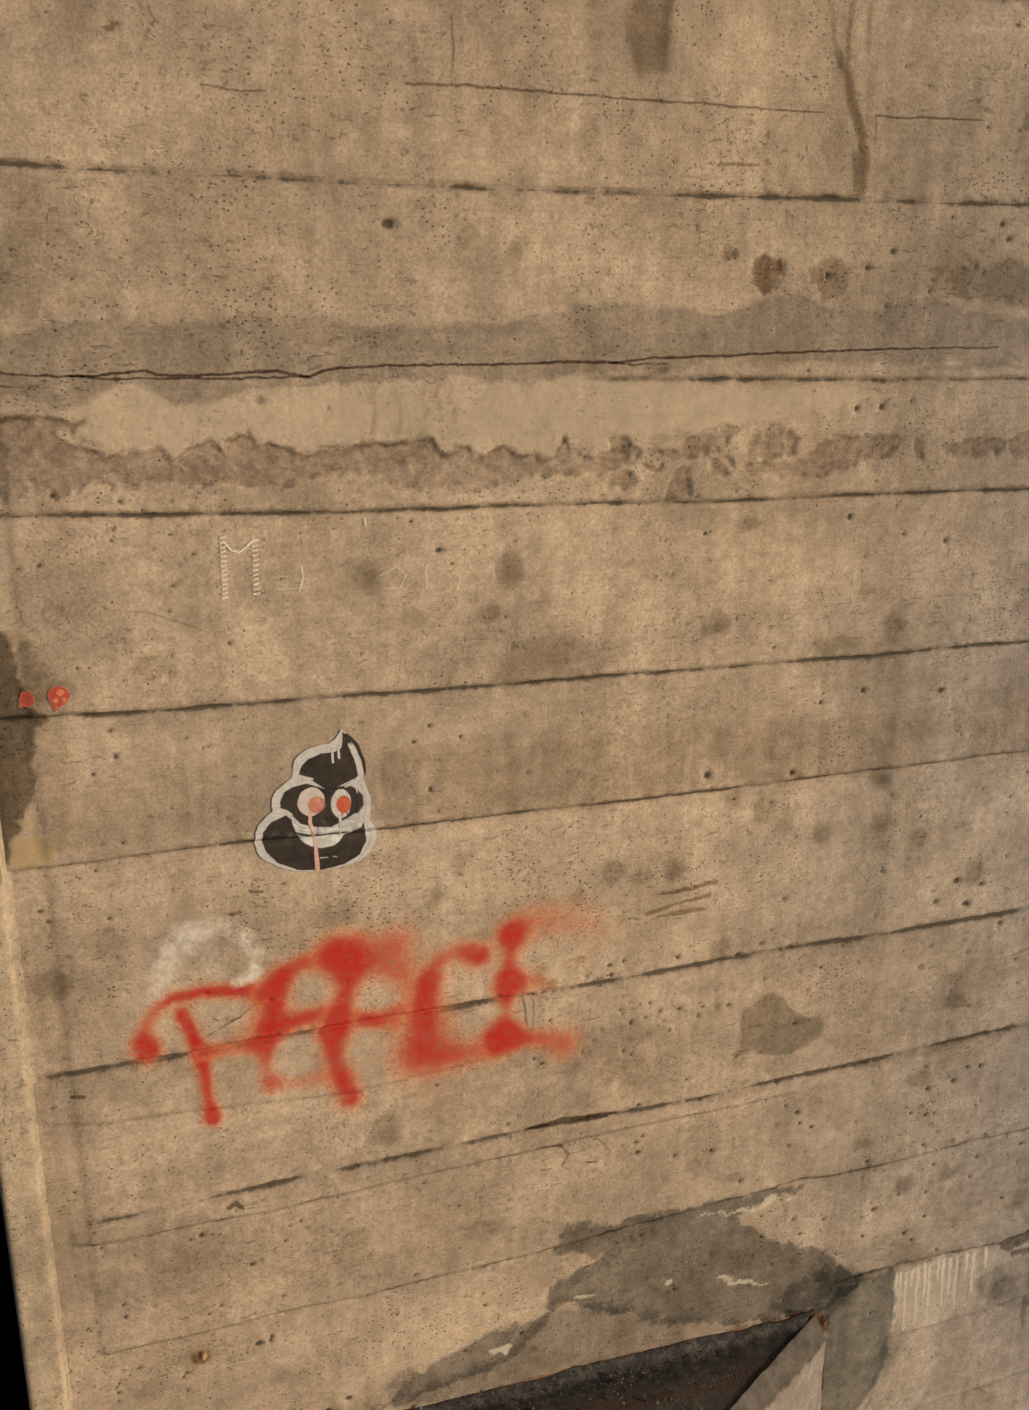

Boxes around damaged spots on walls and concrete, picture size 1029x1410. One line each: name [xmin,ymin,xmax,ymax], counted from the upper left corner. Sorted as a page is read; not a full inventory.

water stain [489,1343,512,1355]